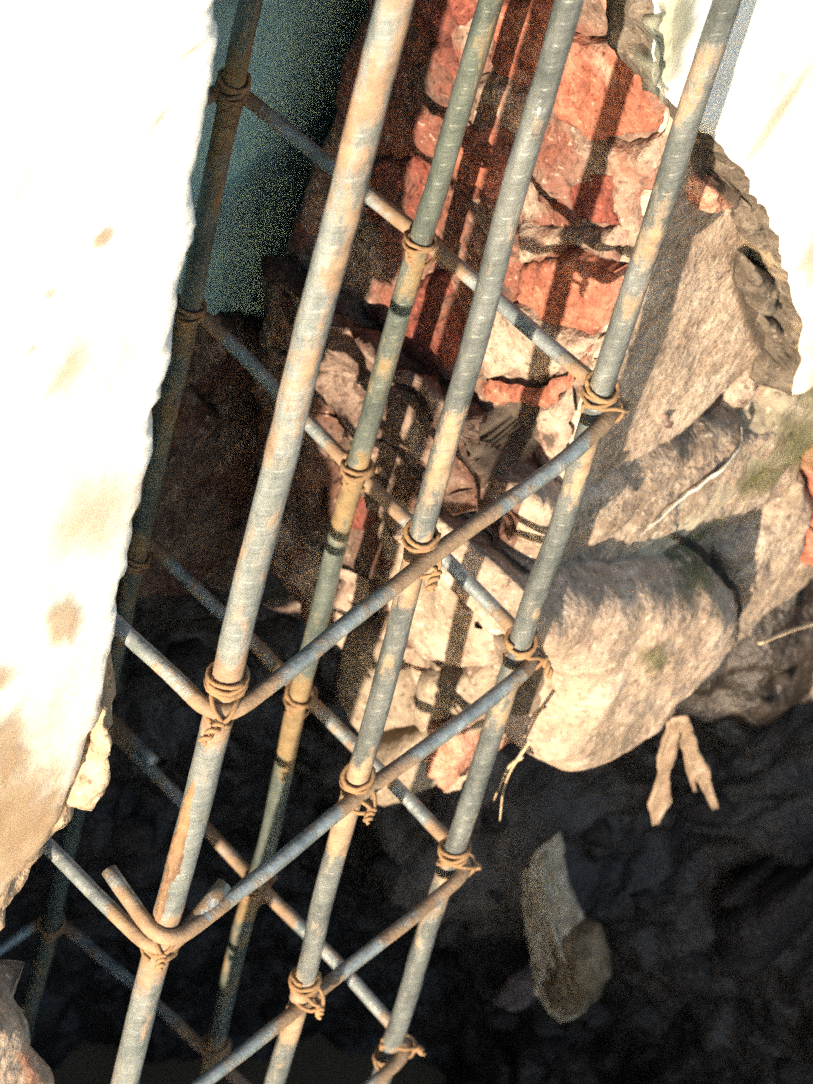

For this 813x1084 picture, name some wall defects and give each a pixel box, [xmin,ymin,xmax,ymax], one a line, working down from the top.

flaking render [489,0,554,86]
flaking render [553,33,666,141]
flaking render [455,125,510,199]
water stain [95,230,111,247]
flaking render [401,270,466,378]
flaking render [514,247,629,363]
flaking render [687,145,799,362]
flaking render [468,373,574,421]
water stain [49,604,77,642]
crack [670,532,743,645]
flaking render [64,702,113,811]
rust [155,780,195,924]